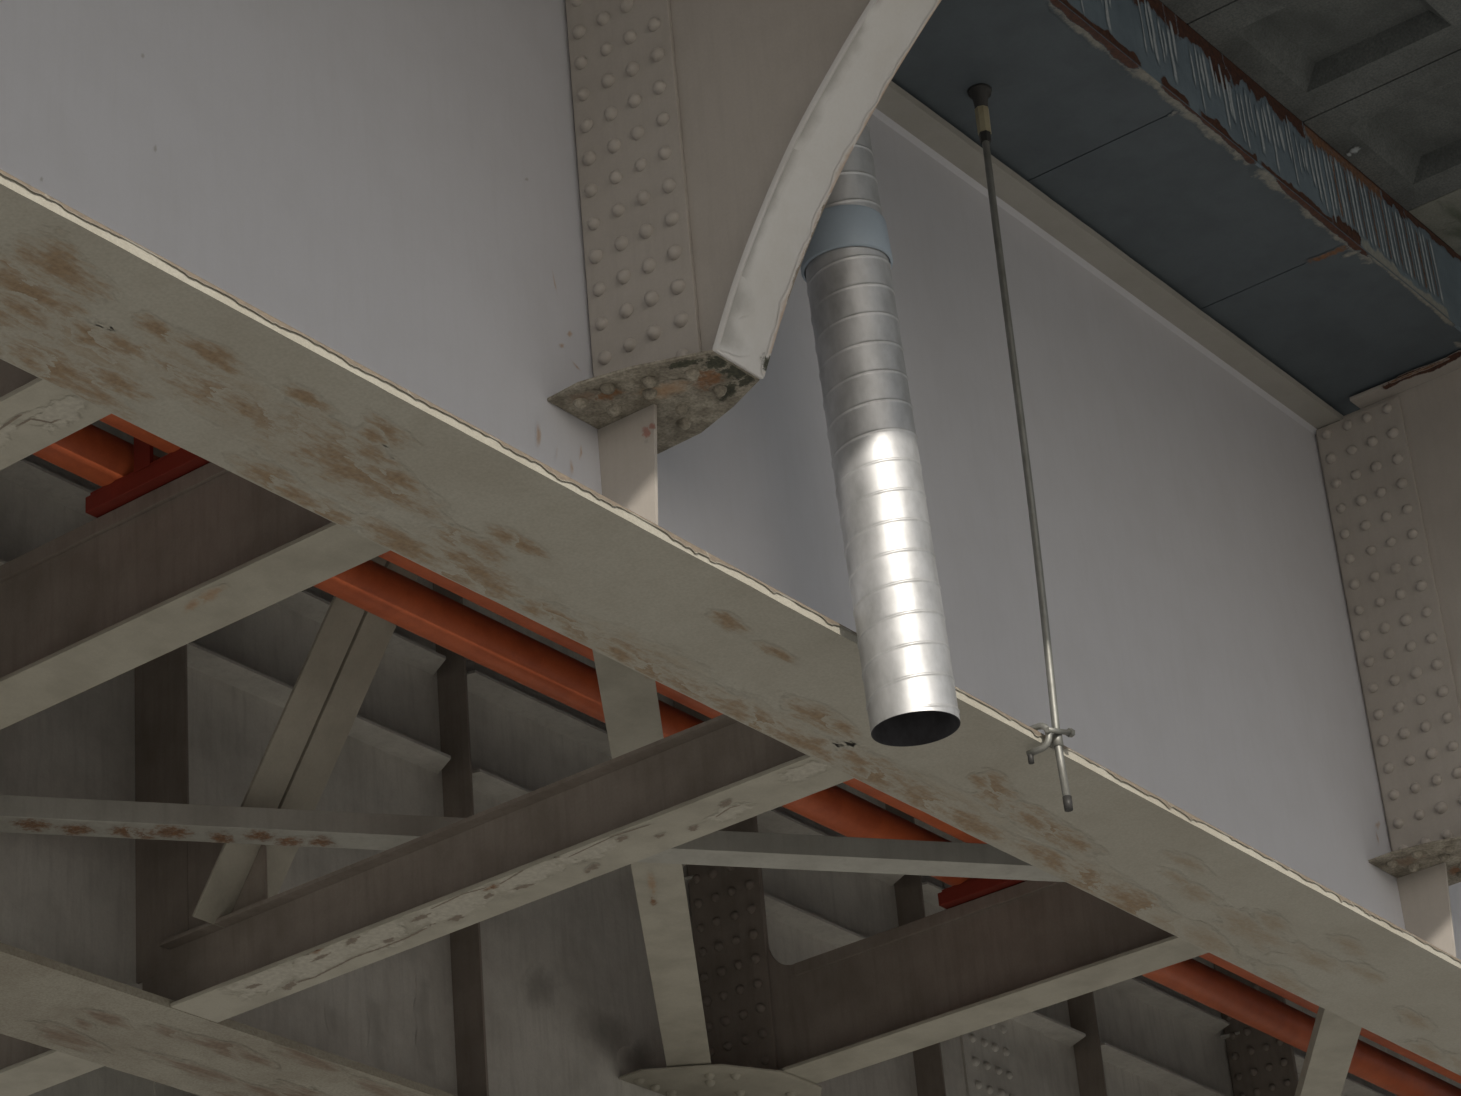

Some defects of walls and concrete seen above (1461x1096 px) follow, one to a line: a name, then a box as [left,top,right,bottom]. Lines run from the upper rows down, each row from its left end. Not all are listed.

leakage [1137,0,1461,348]
rust [1381,350,1461,390]
rust [0,224,1389,1002]
rust [25,1008,282,1086]
rust [1394,1006,1461,1075]